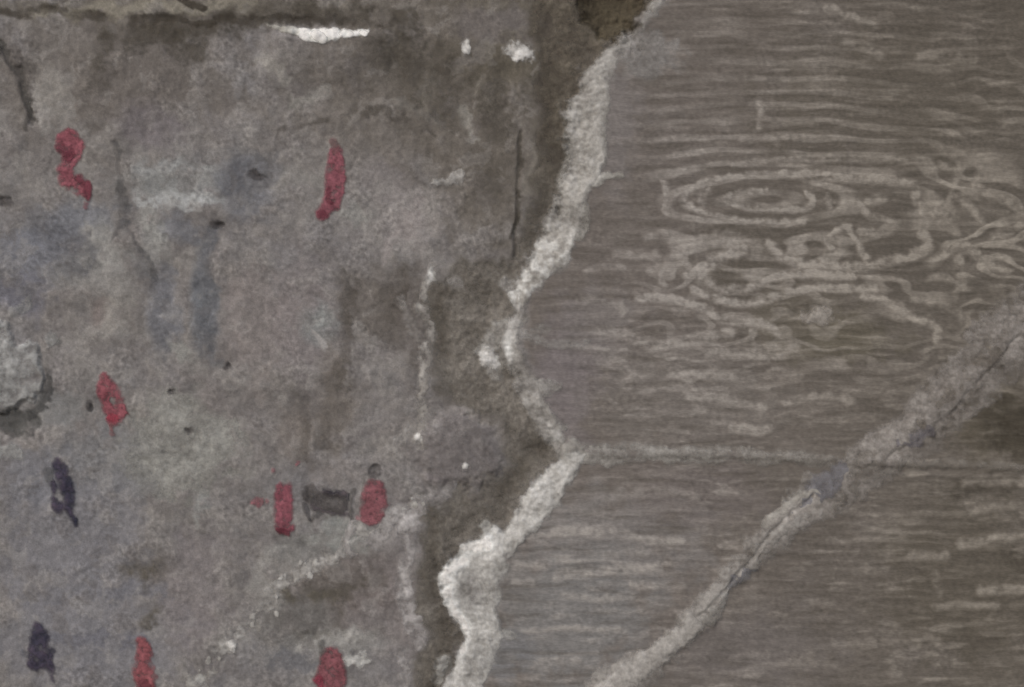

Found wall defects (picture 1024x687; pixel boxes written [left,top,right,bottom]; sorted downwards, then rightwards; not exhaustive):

crack [586,284,1024,687]